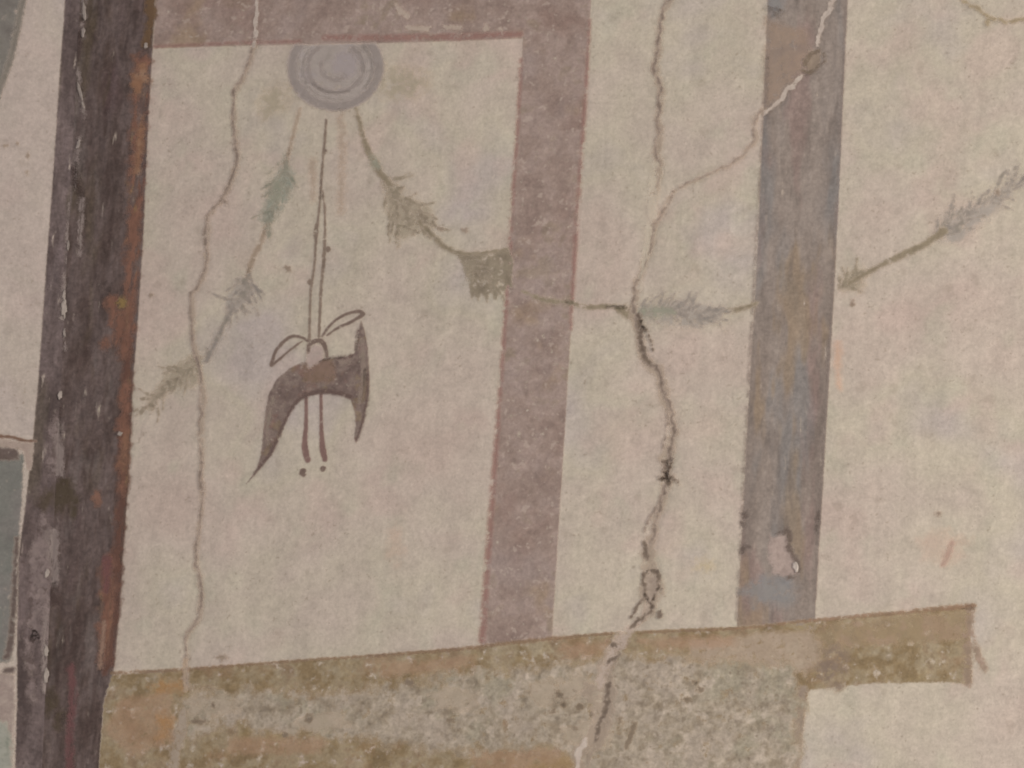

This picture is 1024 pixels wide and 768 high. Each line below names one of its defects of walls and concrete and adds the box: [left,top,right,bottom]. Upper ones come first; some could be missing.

crack [183,0,259,688]
crack [572,0,802,768]
spalling [768,527,801,579]
crack [816,0,836,46]